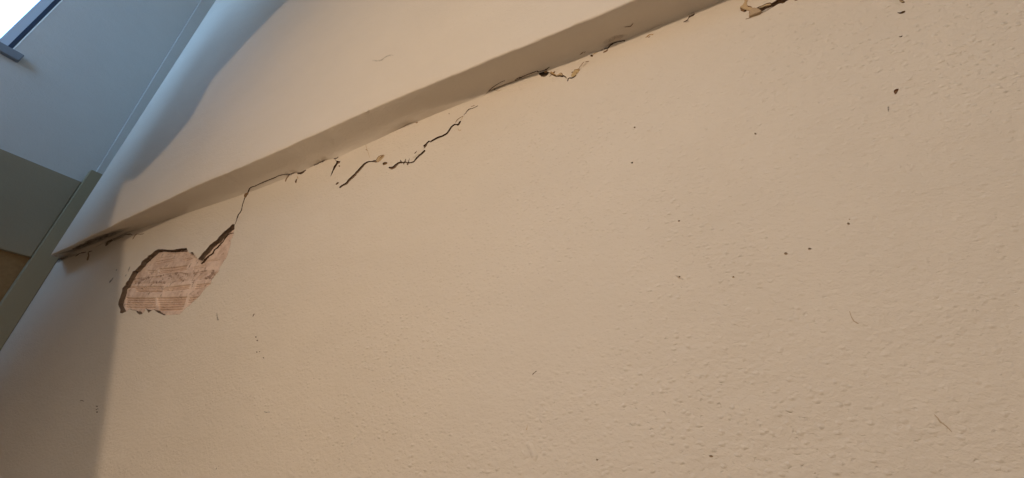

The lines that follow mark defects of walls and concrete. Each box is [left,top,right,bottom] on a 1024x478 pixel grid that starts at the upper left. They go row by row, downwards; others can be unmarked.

flaking render [740,0,797,19]
crack [235,40,625,224]
flaking render [118,224,235,315]